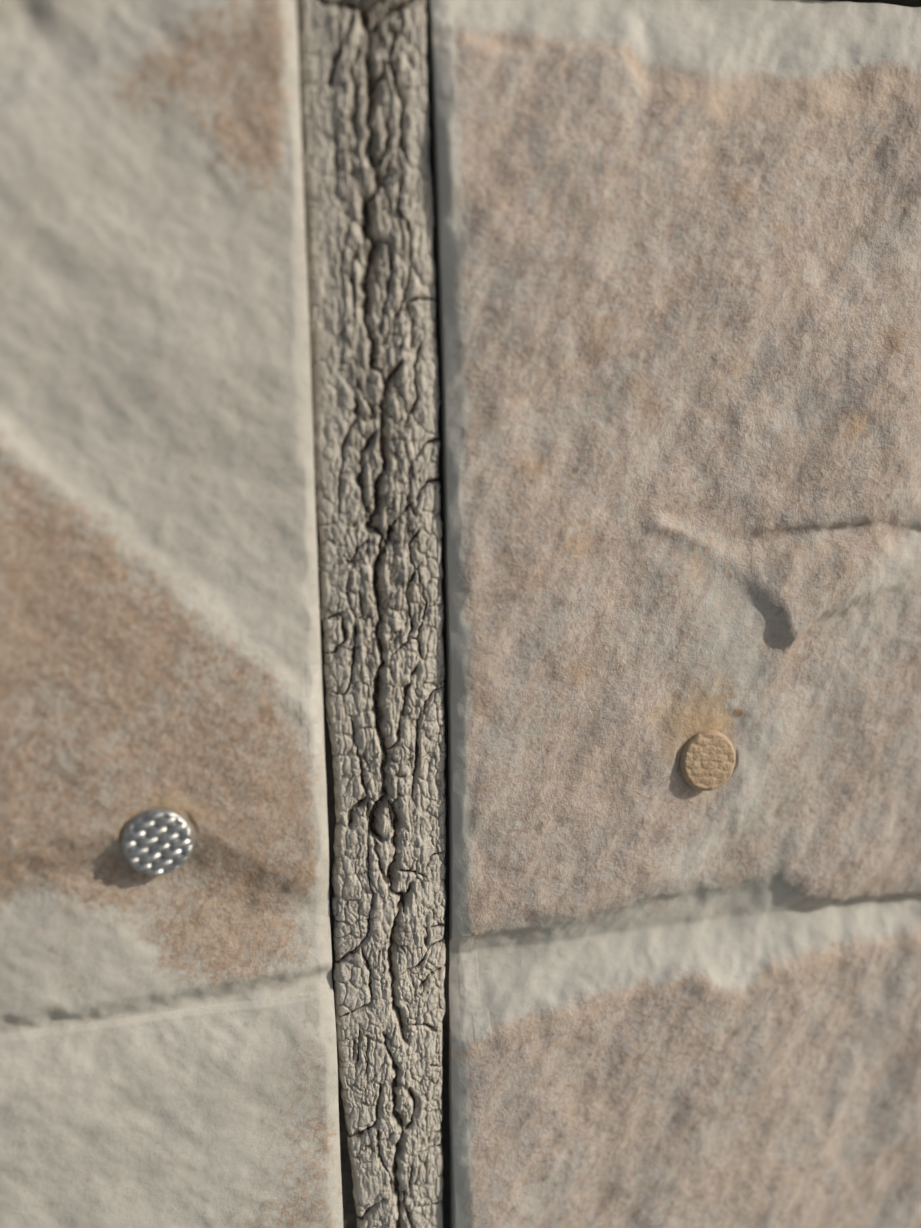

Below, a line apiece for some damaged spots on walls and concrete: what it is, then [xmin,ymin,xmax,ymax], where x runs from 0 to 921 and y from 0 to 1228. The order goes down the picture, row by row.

crack [307,0,446,1228]